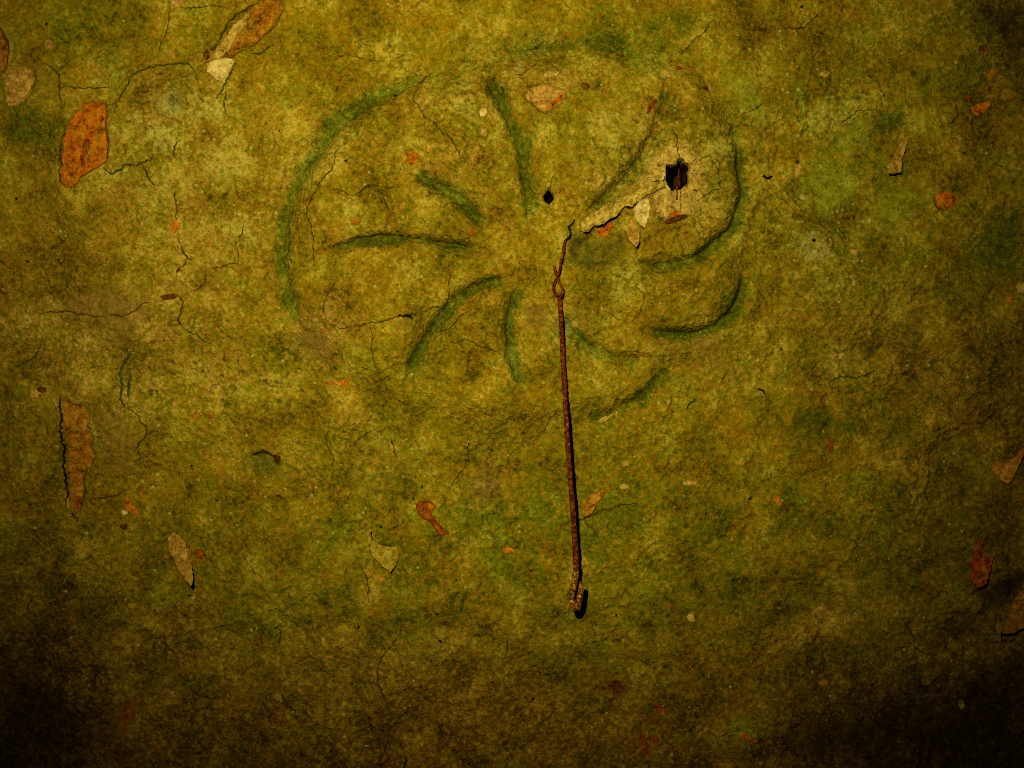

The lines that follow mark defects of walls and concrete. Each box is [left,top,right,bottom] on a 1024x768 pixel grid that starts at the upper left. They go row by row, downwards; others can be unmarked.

flaking render [200,0,282,82]
flaking render [524,70,565,112]
flaking render [58,102,109,189]
flaking render [580,137,709,247]
crack [561,130,773,254]
crack [104,141,244,343]
crack [18,302,149,366]
flaking render [62,400,96,511]
flaking render [412,487,449,537]
flaking render [968,539,993,588]